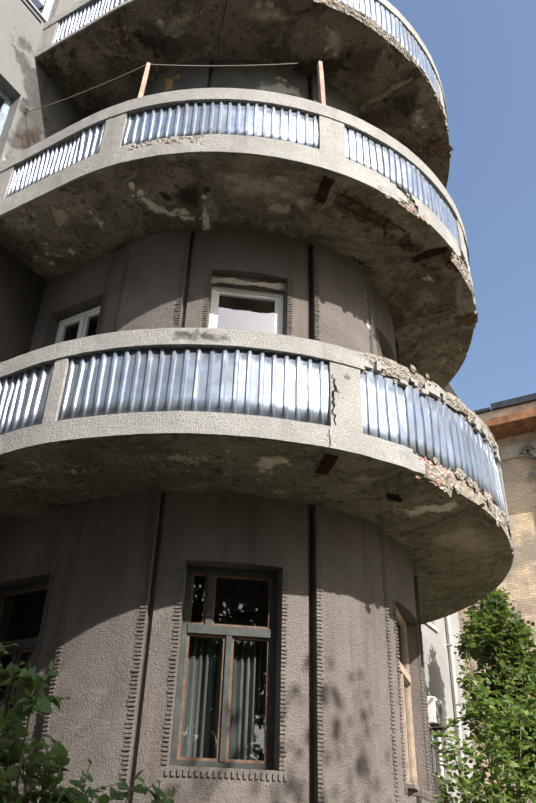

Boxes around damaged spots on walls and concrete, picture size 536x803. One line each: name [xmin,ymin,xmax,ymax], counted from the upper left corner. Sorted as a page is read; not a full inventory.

spalling [314,0,410,61]
spalling [424,141,454,157]
corrosion [314,176,335,205]
spalling [358,351,497,445]
peeling [250,454,294,499]
corrosion [314,453,339,475]
spalling [414,453,512,534]